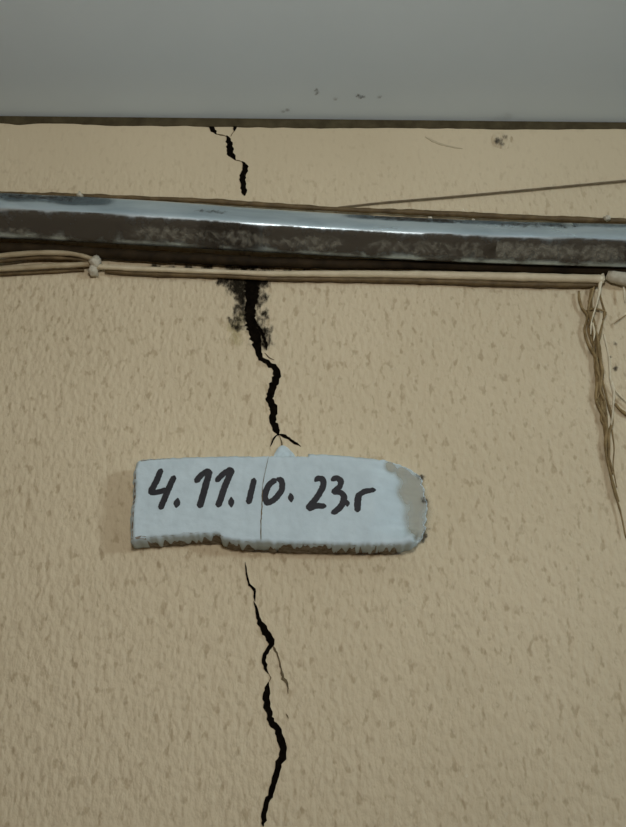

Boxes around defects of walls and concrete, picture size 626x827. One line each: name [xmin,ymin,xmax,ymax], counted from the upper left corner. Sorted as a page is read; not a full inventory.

crack [244,270,301,535]
crack [245,563,289,826]